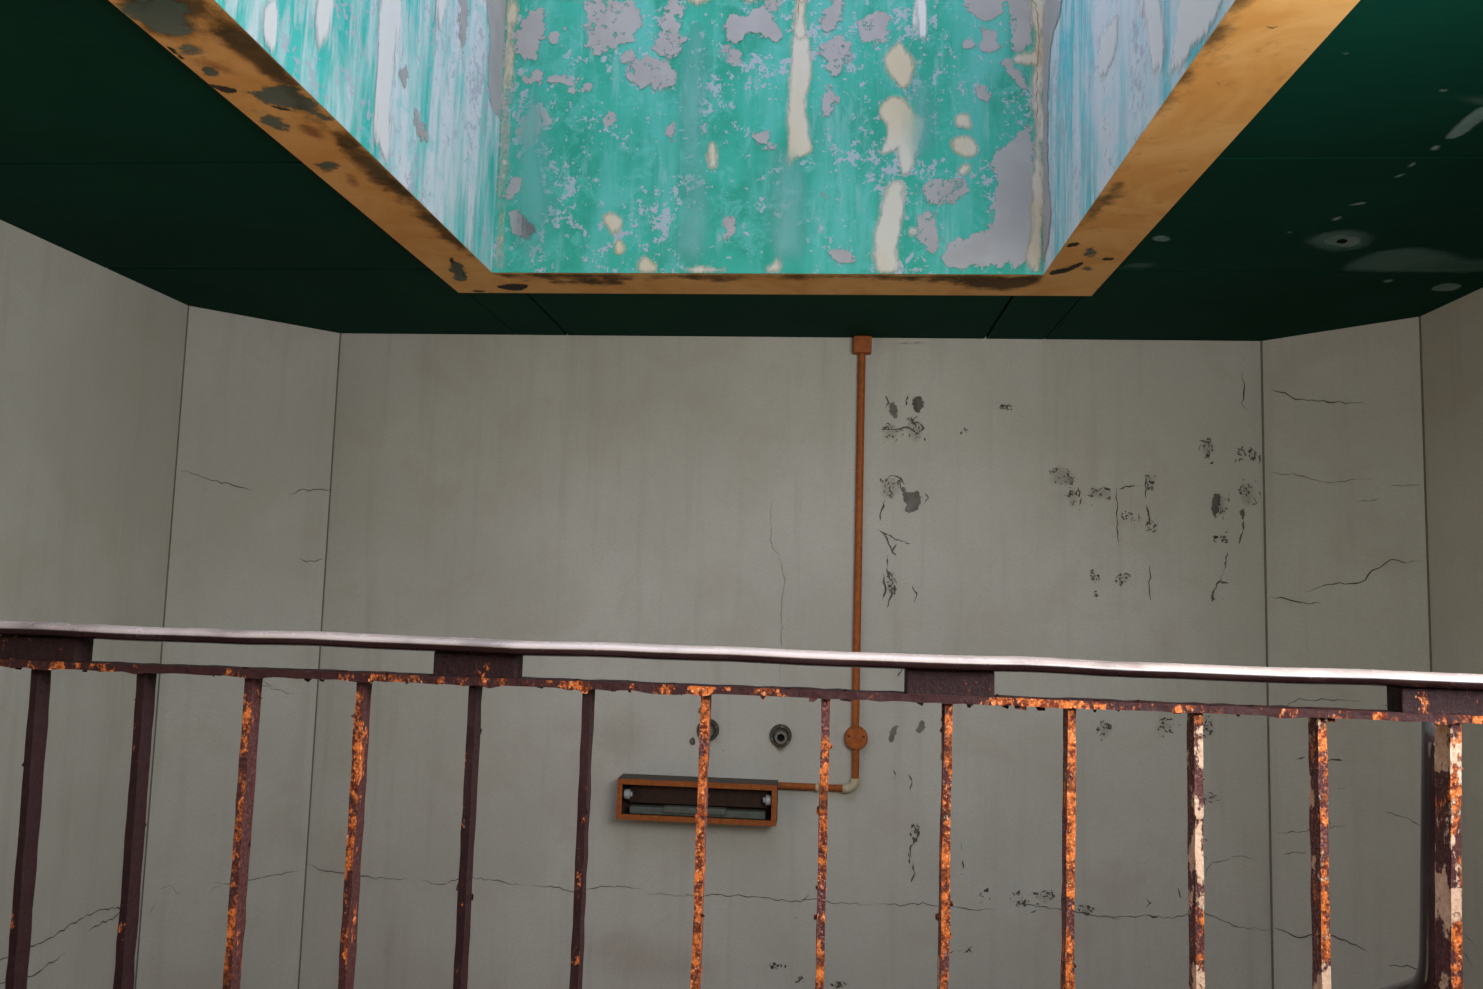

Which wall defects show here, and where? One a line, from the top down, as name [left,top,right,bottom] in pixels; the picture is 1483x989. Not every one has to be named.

peeling [458,0,594,147]
peeling [581,0,689,91]
peeling [719,0,784,67]
peeling [816,0,892,117]
peeling [117,0,528,292]
peeling [912,0,1114,275]
flaking render [881,395,926,443]
crack [1241,358,1361,408]
flaking render [879,475,929,520]
flaking render [1211,493,1230,602]
crack [1273,559,1412,604]
crack [0,885,177,984]